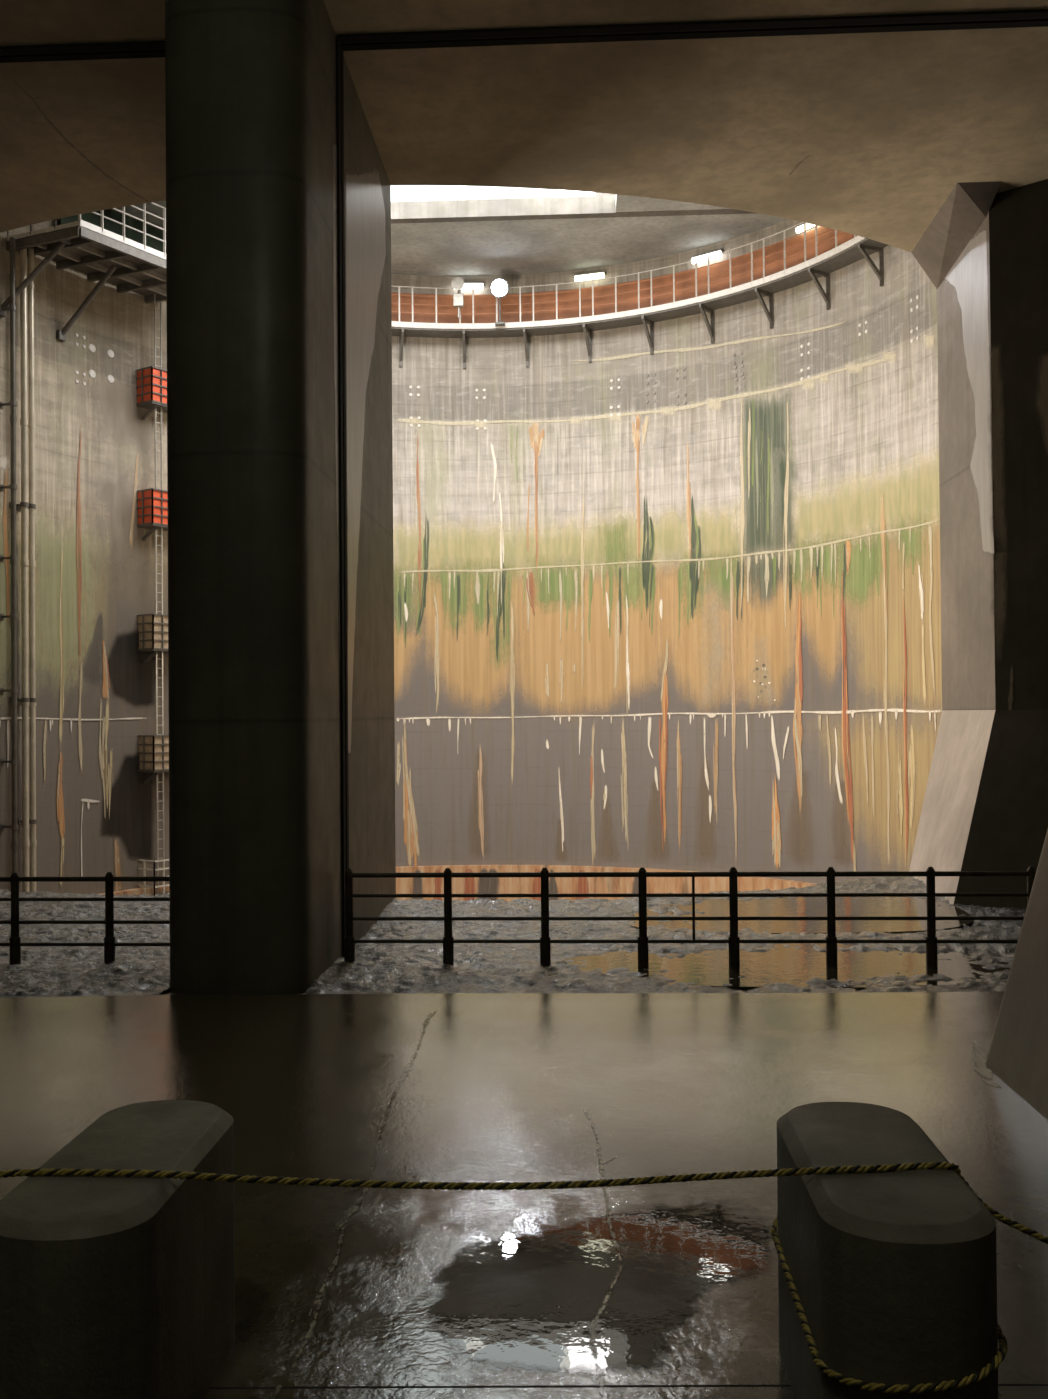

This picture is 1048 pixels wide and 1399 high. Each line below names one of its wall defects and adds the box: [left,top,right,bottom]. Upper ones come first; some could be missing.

leakage [87,380,159,454]
rust [57,434,82,885]
leakage [0,475,155,779]
rust [99,640,112,817]
leakage [81,755,153,877]
rust [396,724,442,900]
leakage [394,353,942,862]
rust [659,642,682,848]
rust [772,595,809,867]
rust [834,540,856,872]
crack [271,1010,436,1399]